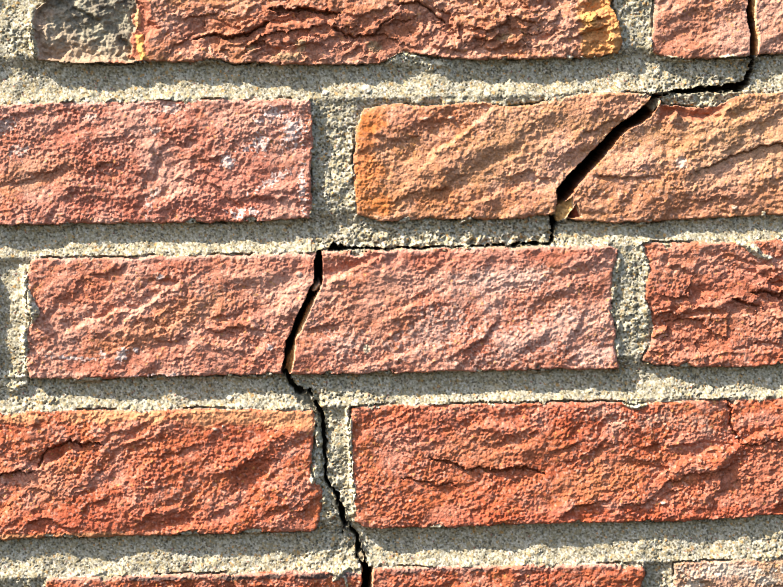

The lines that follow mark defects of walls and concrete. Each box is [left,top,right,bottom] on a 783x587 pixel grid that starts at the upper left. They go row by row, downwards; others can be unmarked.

spalling [33,0,163,65]
crack [194,0,446,41]
crack [282,0,761,587]
crack [732,290,783,308]
crack [727,400,783,447]